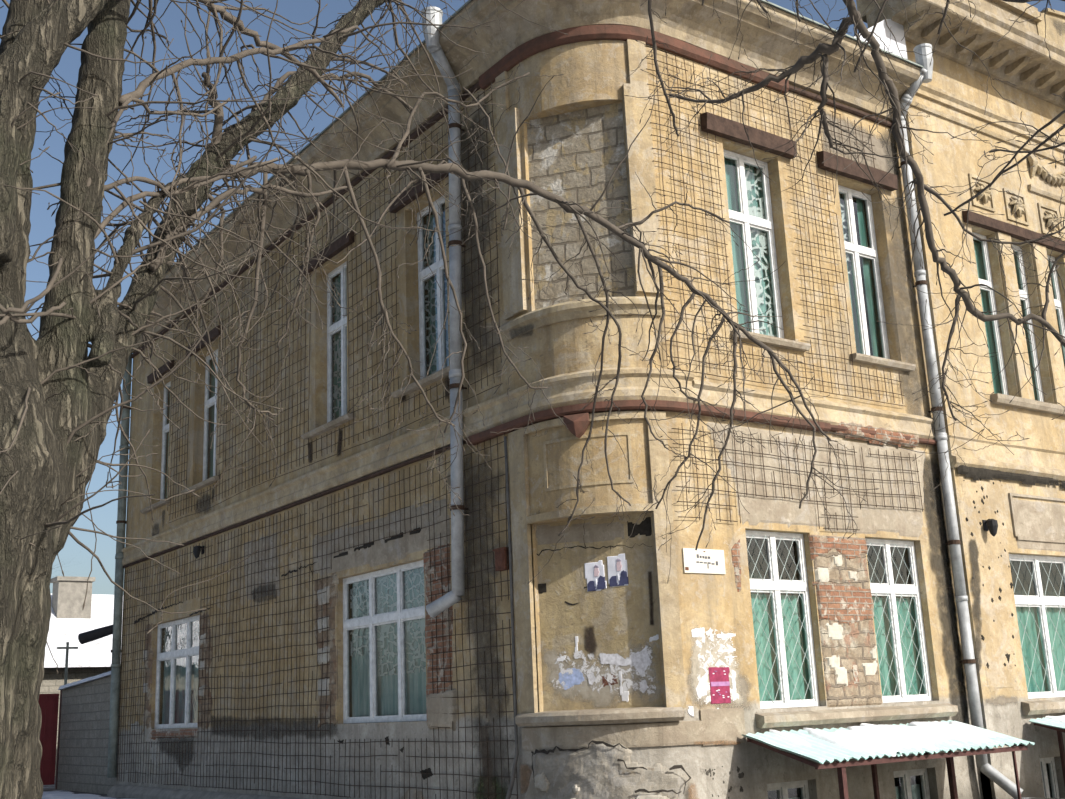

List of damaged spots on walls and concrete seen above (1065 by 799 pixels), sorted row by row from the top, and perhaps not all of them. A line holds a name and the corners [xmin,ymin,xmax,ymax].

spalling [835,422,919,447]
flaking render [314,572,339,729]
flaking render [423,543,453,712]
damp [463,459,509,789]
flaking render [808,534,882,707]
spalling [524,743,694,799]
crack [531,740,691,794]
spalling [705,766,744,799]